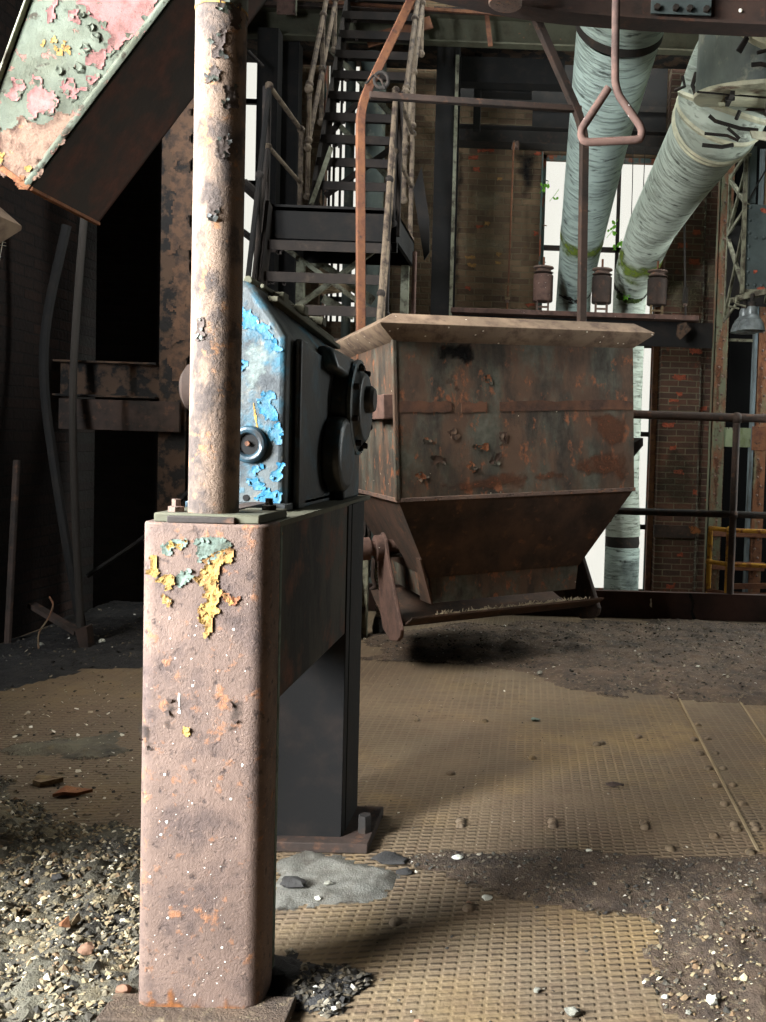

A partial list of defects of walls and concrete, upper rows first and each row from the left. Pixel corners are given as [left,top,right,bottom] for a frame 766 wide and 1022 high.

peeling [4,0,157,120]
peeling [145,536,240,639]
corrosion [140,991,198,1008]